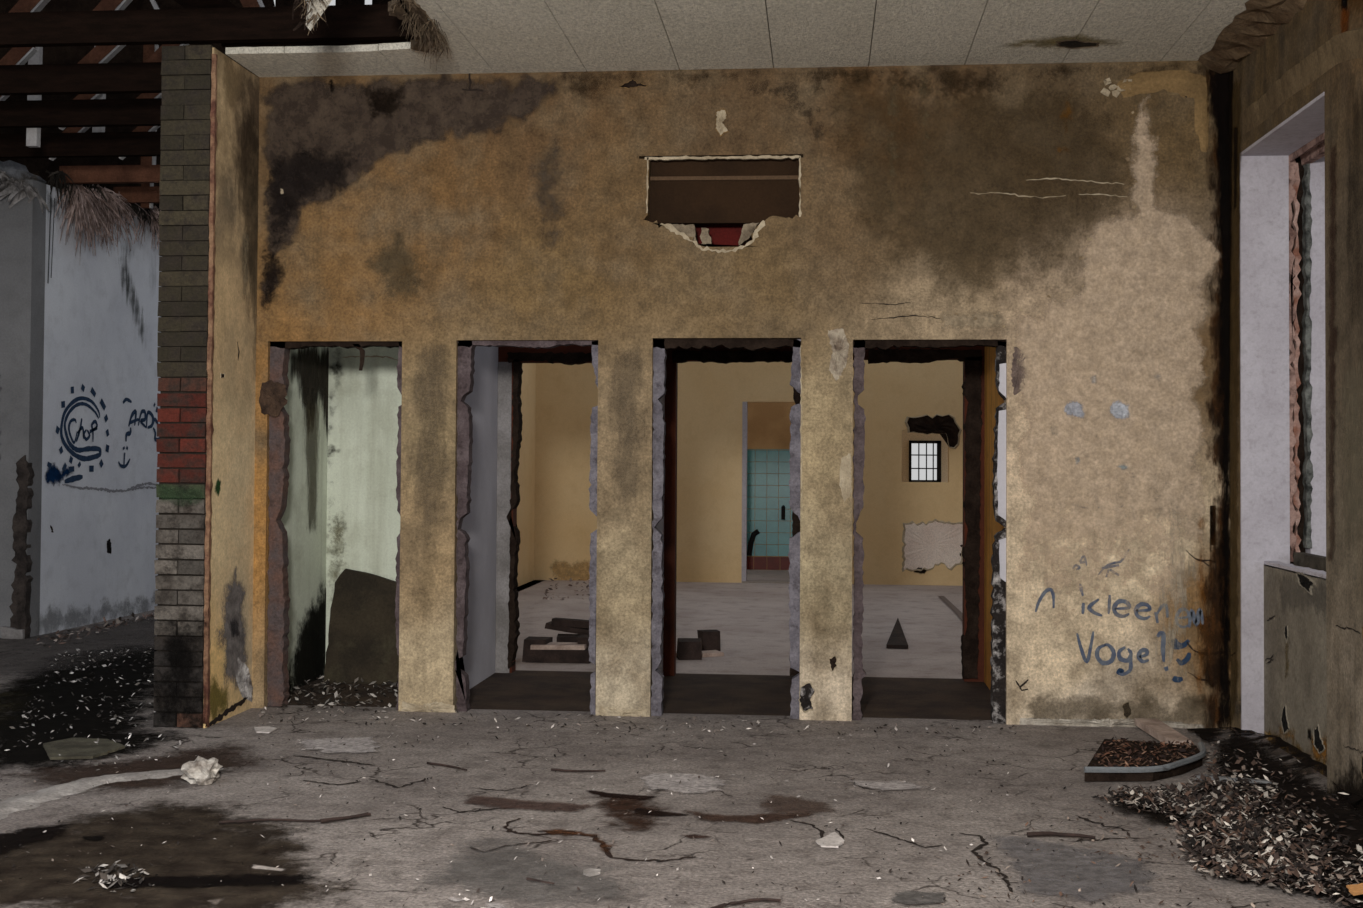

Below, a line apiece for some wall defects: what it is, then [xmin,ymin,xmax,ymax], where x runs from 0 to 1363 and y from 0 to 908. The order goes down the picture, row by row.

spalling [715,108,728,137]
damp [243,72,598,304]
spalling [638,155,803,253]
crack [975,178,1127,198]
damp [122,264,143,334]
spalling [259,380,288,417]
damp [291,347,341,527]
spalling [905,414,962,449]
damp [1160,65,1241,729]
spalling [9,455,35,639]
damp [289,522,343,692]
damp [1110,797,1198,827]